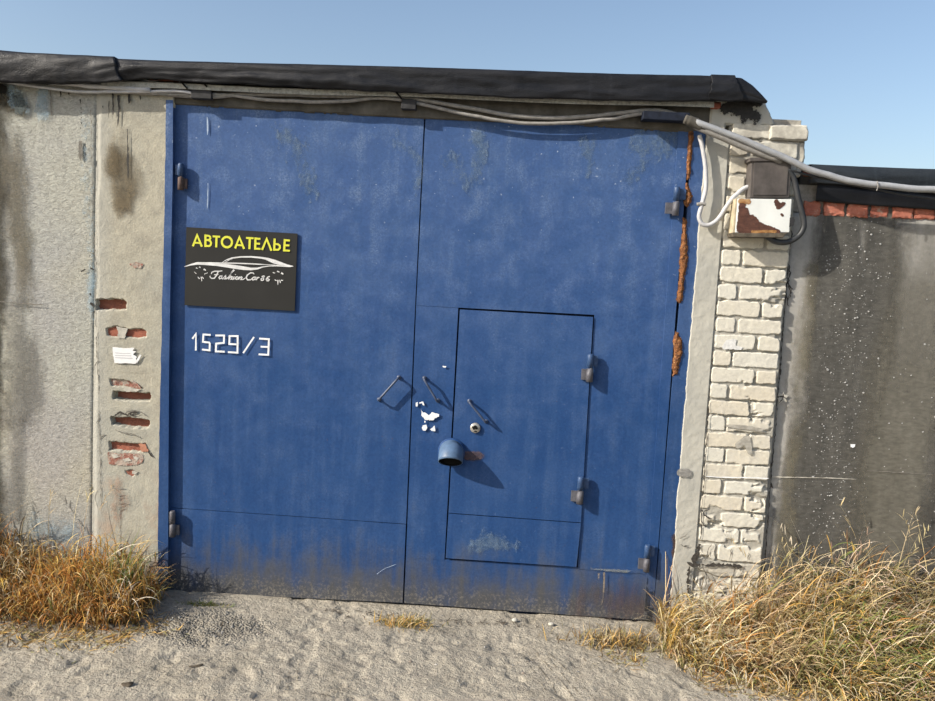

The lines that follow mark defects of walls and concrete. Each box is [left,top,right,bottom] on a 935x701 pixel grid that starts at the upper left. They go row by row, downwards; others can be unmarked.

damp [0,91,30,323]
damp [105,129,136,213]
spalling [108,326,147,339]
spalling [108,410,153,476]
spalling [111,379,151,399]
damp [775,204,935,617]